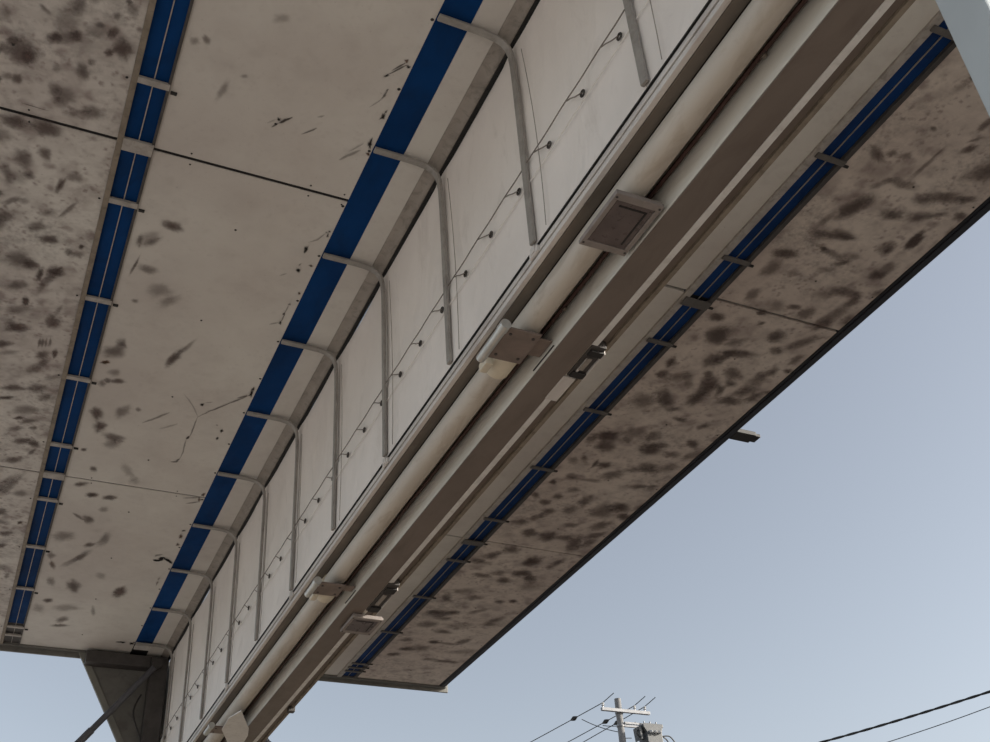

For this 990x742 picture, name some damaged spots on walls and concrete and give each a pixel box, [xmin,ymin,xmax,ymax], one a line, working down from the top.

damp [105,29,131,57]
damp [4,117,57,135]
damp [932,194,972,219]
damp [12,255,52,283]
damp [690,351,770,404]
damp [92,408,119,441]
damp [595,433,614,450]
damp [640,445,657,472]
damp [524,504,628,550]